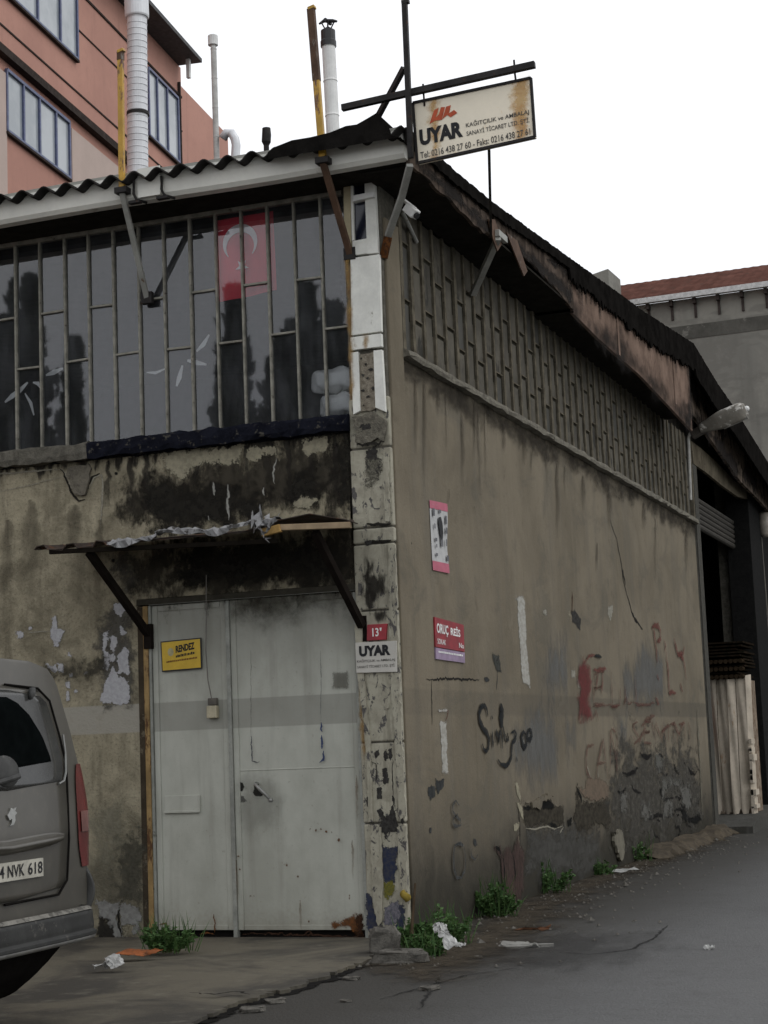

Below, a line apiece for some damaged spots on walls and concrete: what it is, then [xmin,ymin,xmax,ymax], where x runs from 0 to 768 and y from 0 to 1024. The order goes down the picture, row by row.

leakage [0,432,385,622]
crack [611,524,642,628]
spalling [93,601,137,709]
peeling [365,748,405,937]
spalling [513,731,708,884]
corrosion [243,914,365,937]